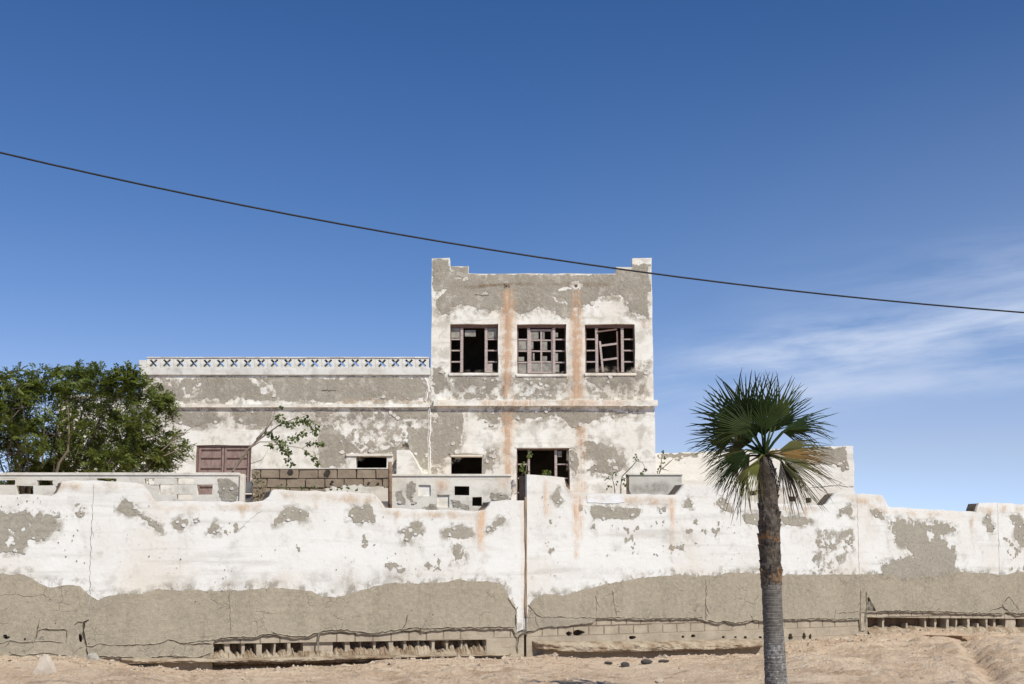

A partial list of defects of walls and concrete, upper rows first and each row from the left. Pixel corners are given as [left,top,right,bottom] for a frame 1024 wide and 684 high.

peeling [432,259,651,320]
peeling [144,362,650,548]
peeling [800,446,849,472]
peeling [0,497,85,555]
peeling [114,498,240,535]
peeling [578,504,666,554]
peeling [653,497,759,556]
crack [0,482,1024,658]
flaking render [780,503,1024,634]
flaking render [0,553,763,667]